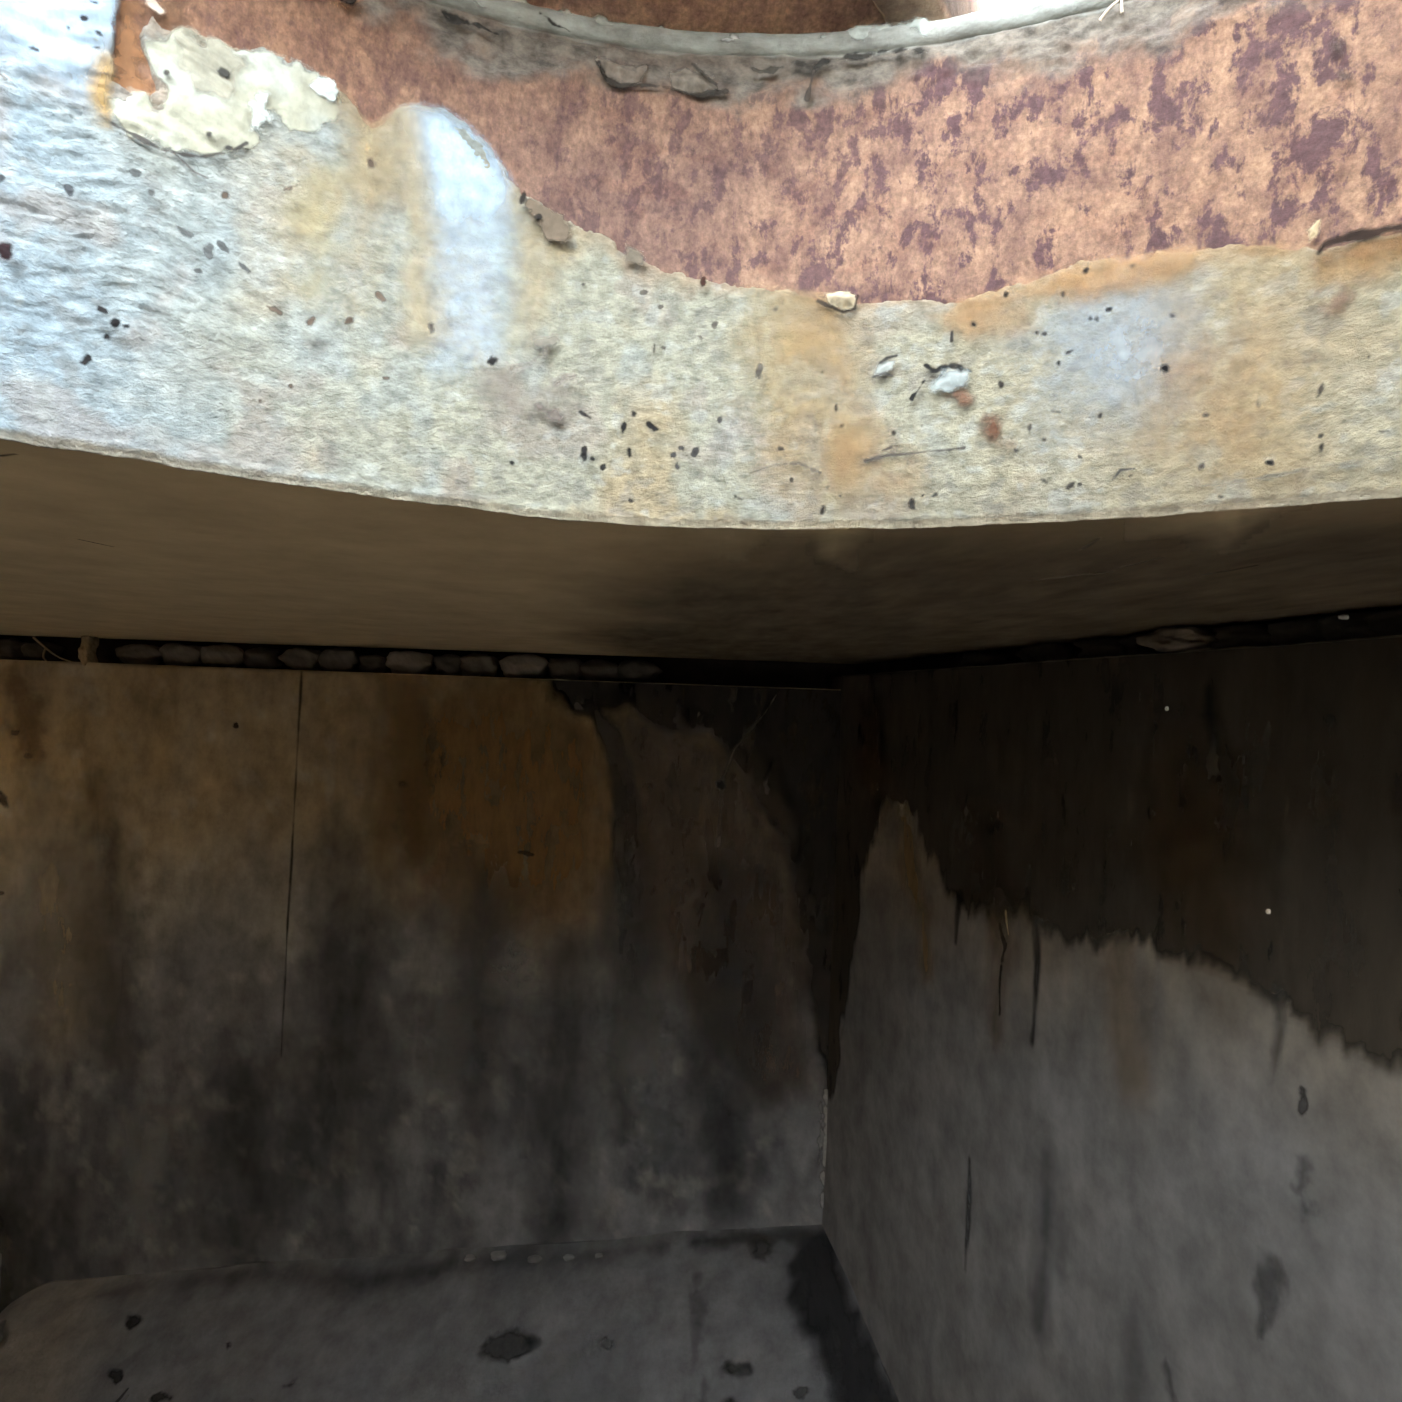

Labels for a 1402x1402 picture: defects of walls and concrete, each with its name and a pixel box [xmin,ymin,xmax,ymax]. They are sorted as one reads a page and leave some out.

spalling [67,1,102,49]
peeling [146,0,164,14]
peeling [596,56,729,98]
hole [129,168,155,196]
hole [177,226,251,273]
spalling [1308,220,1402,260]
peeling [816,291,859,313]
damp [551,637,1402,1208]